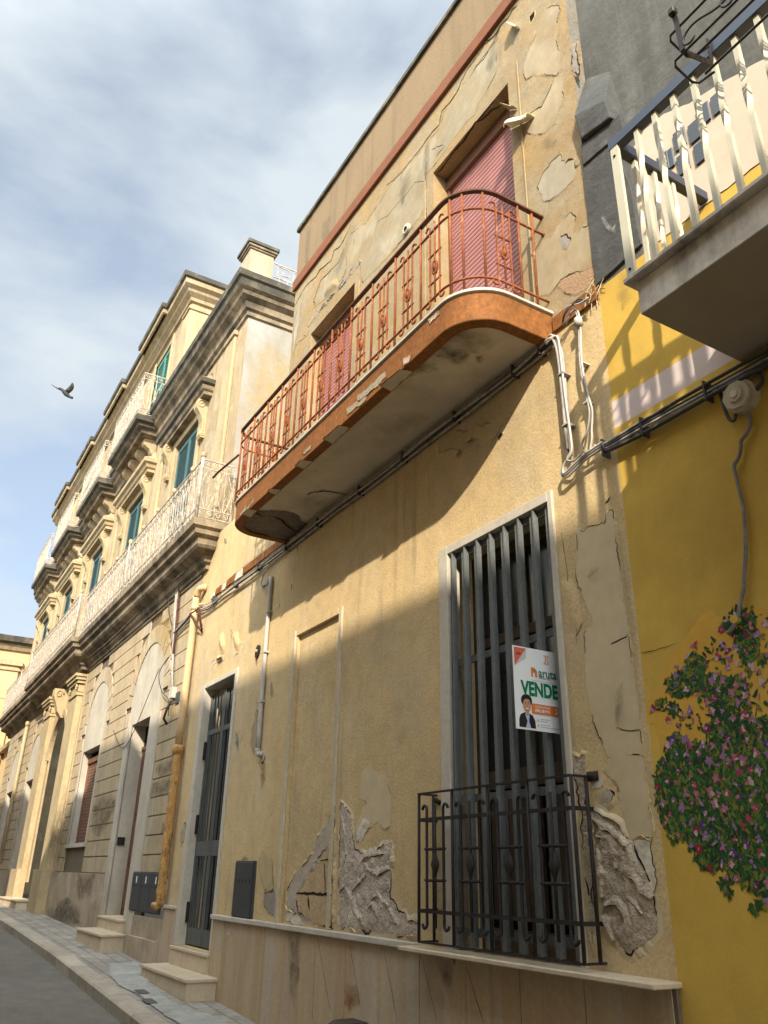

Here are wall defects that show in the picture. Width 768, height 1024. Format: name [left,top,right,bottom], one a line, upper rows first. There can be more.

flaking render [500,3,582,136]
flaking render [536,152,576,203]
crack [296,227,350,305]
spalling [239,498,310,540]
flaking render [572,507,664,962]
flaking render [258,763,423,941]